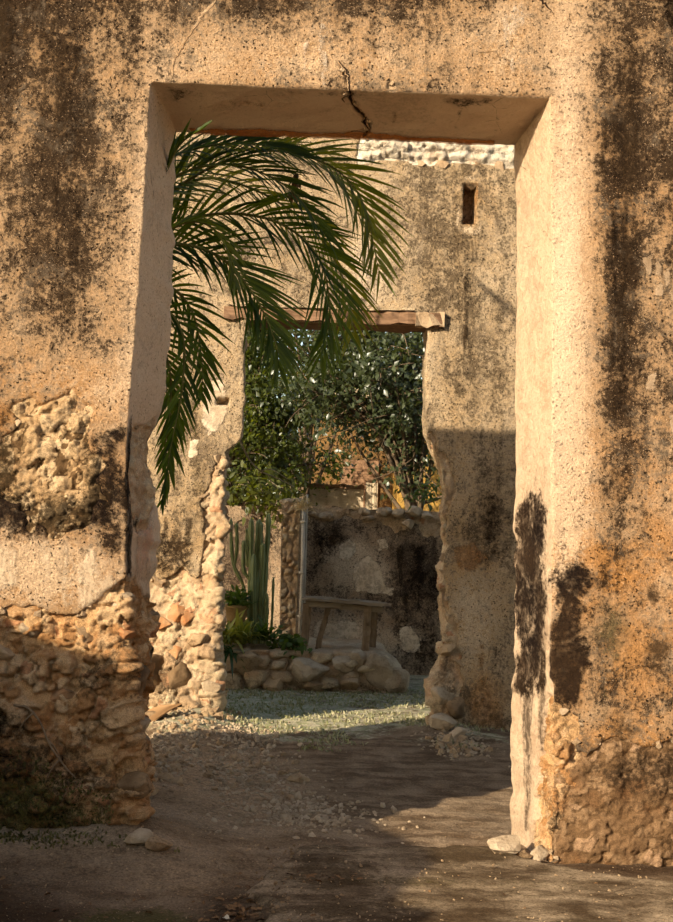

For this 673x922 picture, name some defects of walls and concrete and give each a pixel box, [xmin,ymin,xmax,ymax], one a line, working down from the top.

crack [537,0,554,15]
damp [40,21,93,156]
crack [325,61,373,136]
damp [600,49,641,436]
damp [0,491,48,547]
flaking render [0,389,108,581]
damp [81,418,168,574]
flaking render [128,418,156,534]
flaking render [0,452,234,828]
damp [645,639,671,669]
flaking render [533,696,673,867]